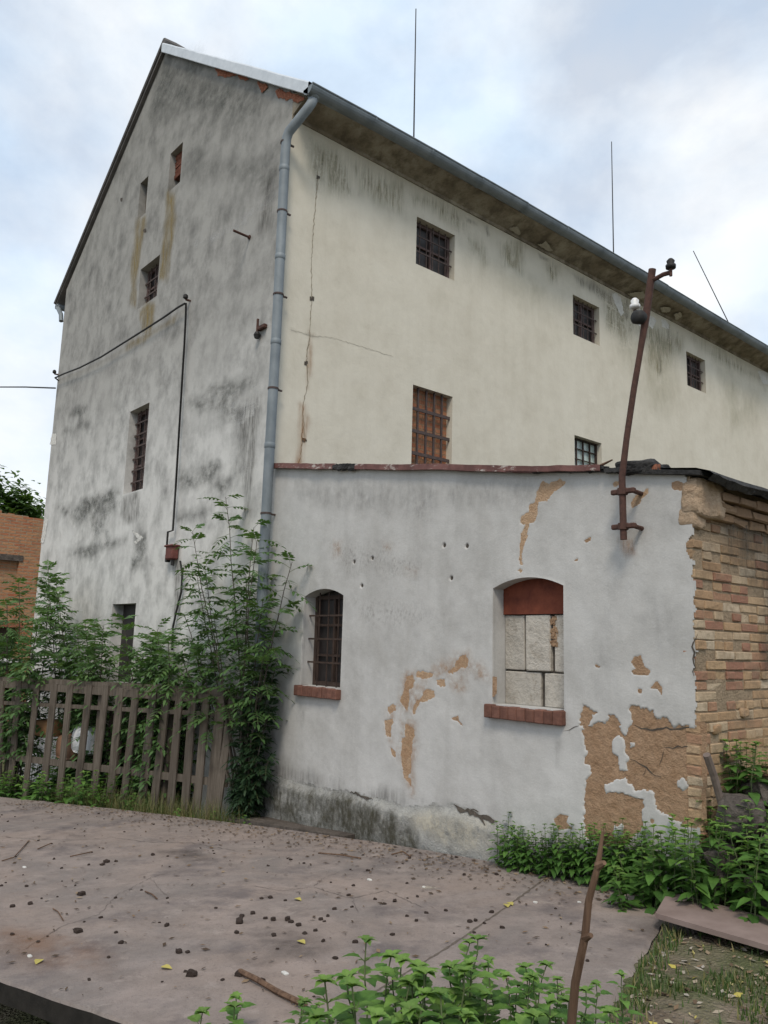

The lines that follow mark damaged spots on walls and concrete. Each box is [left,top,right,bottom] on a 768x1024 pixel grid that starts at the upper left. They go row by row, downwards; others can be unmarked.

flaking render [215,68,304,103]
crack [293,167,393,459]
flaking render [518,479,566,573]
flaking render [384,655,468,786]
flaking render [631,655,662,695]
leakage [262,783,415,848]
flaking render [554,705,722,847]